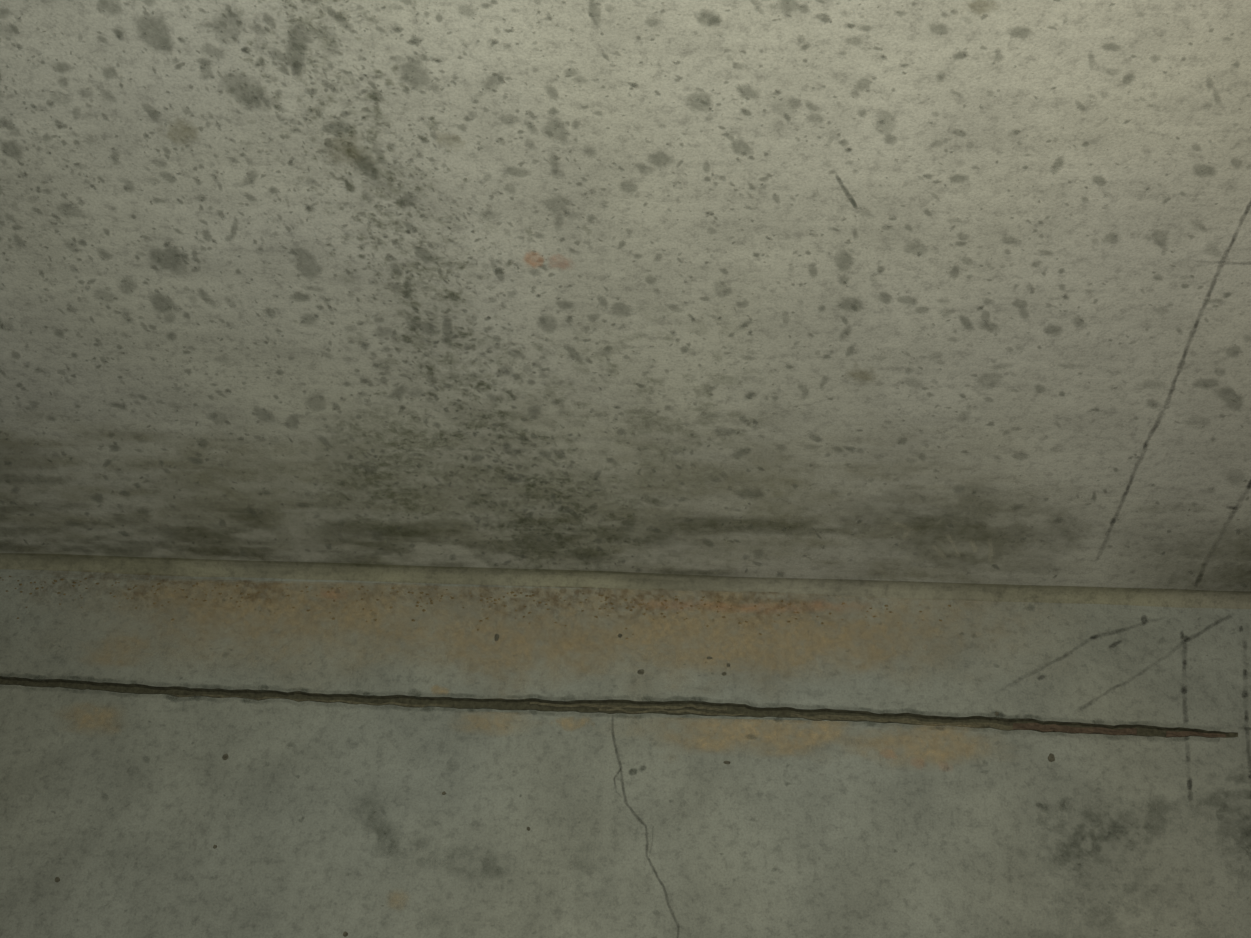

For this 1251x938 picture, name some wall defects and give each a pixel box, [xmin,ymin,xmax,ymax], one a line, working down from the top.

crack [0,676,1238,738]